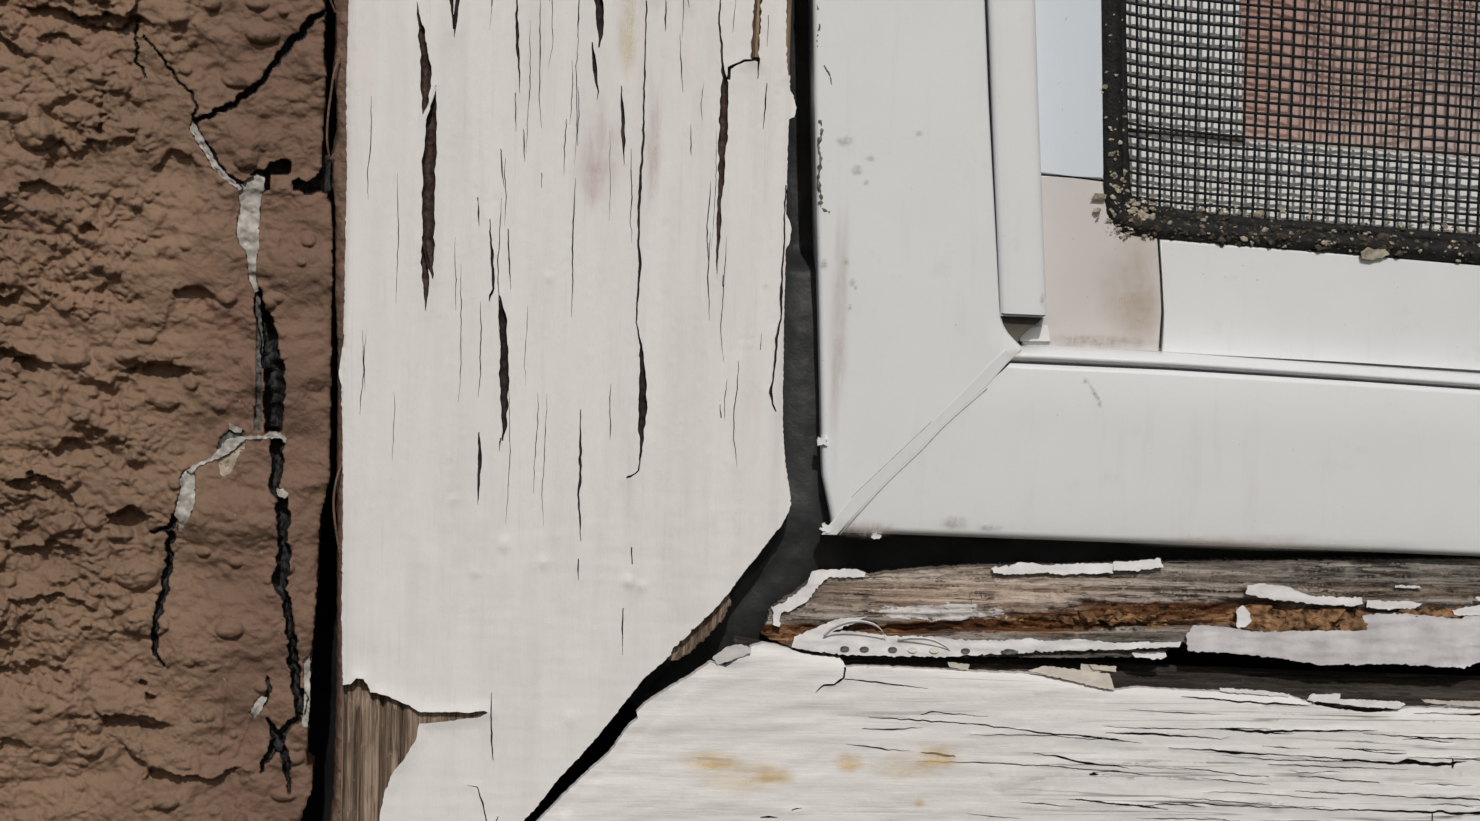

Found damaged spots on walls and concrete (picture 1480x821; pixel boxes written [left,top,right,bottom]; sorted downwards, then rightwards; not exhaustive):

peeling [750,0,763,58]
crack [133,0,832,793]
peeling [991,558,1163,575]
peeling [771,568,1480,690]
peeling [340,678,488,821]
crack [816,667,1480,821]